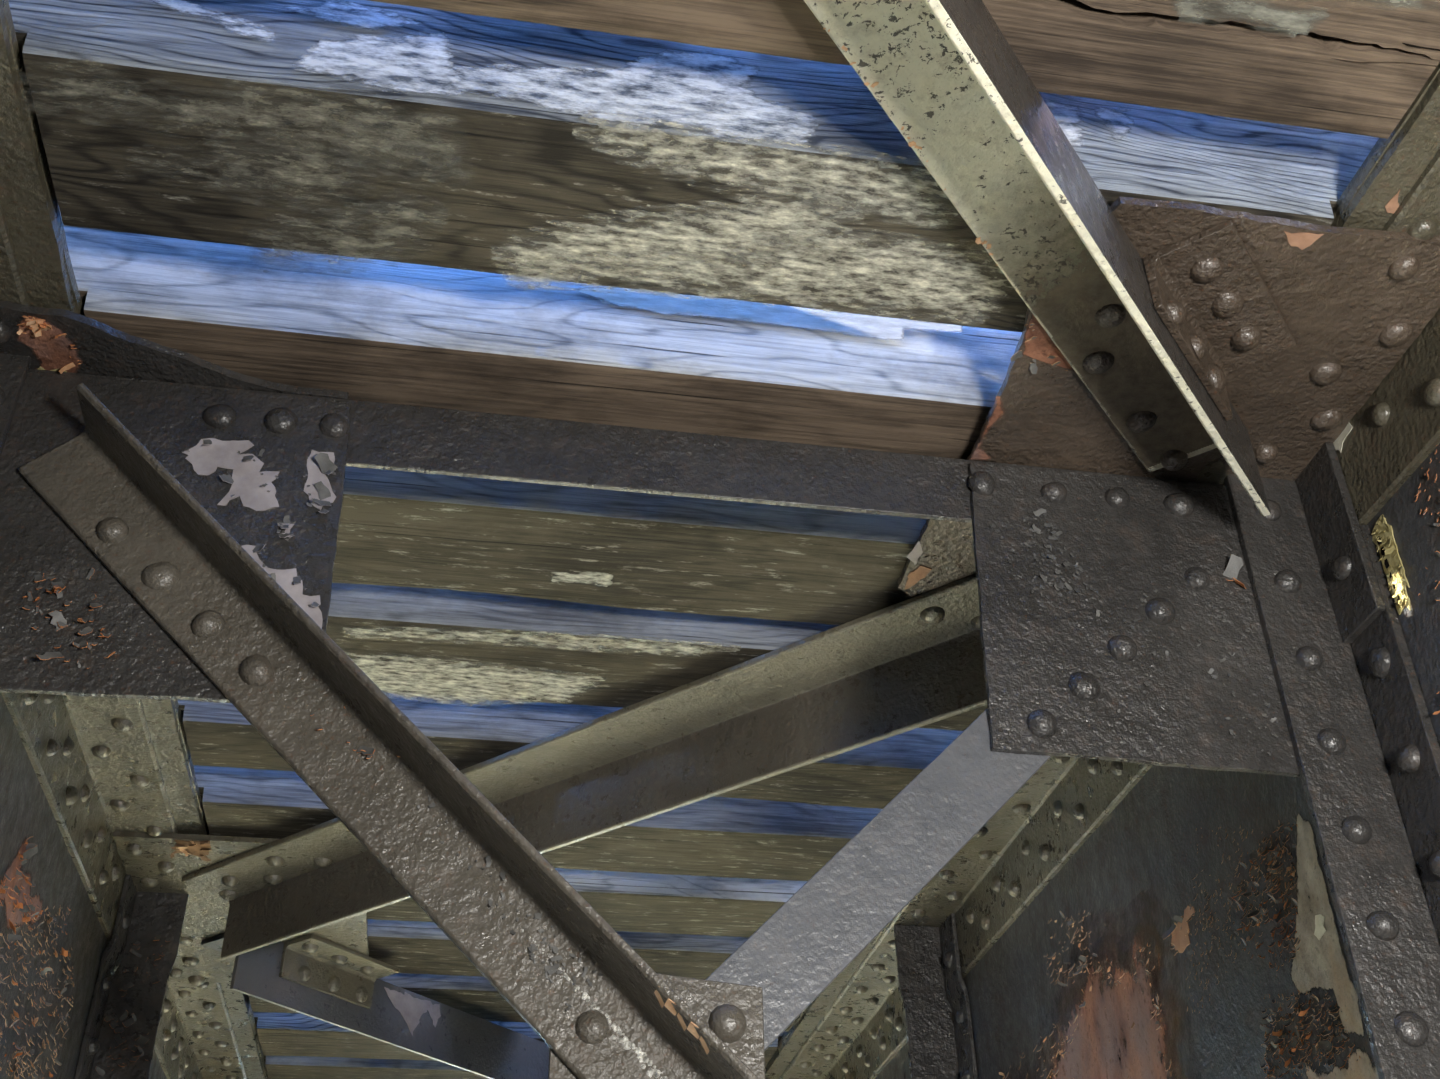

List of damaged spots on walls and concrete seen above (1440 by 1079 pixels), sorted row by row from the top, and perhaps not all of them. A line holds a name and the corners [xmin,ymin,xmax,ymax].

crack [1403,43,1440,51]
leakage [25,0,1214,468]
corrosion [18,316,81,373]
spalling [303,450,338,514]
spalling [182,438,323,629]
corrosion [0,837,43,934]
corrosion [999,910,1184,1079]